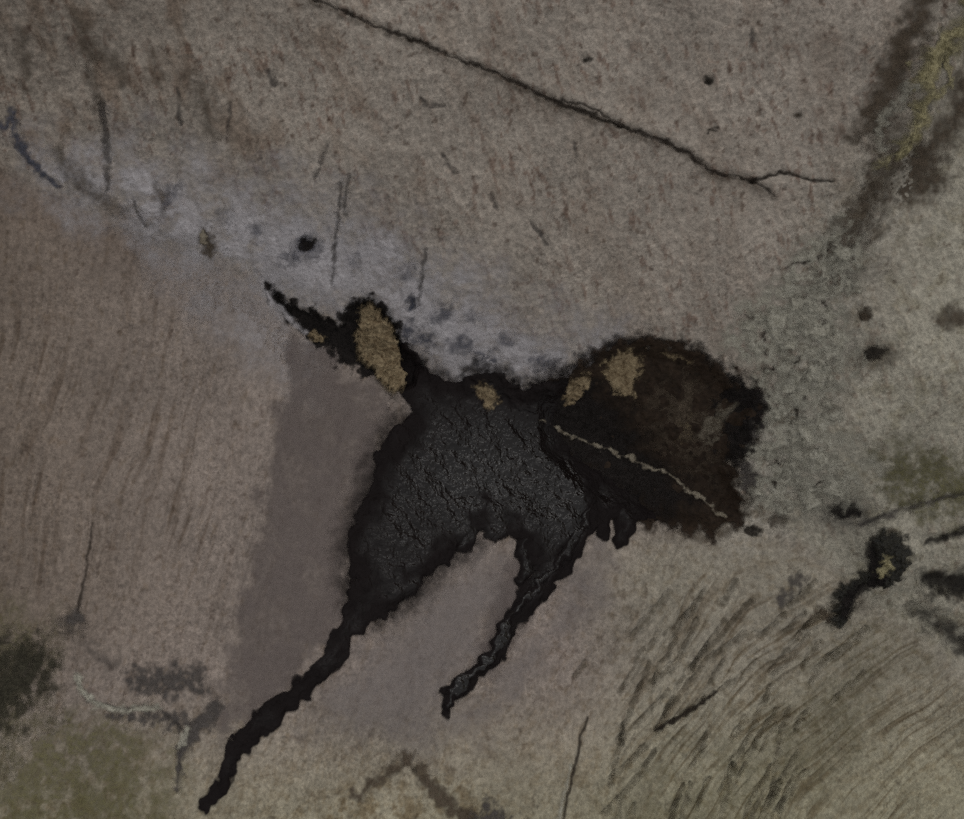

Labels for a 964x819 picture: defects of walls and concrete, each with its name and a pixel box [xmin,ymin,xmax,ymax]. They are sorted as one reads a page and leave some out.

leakage [0,108,109,198]
crack [313,0,831,194]
leakage [875,18,964,168]
spalling [264,281,410,394]
leakage [120,166,657,815]
spalling [543,335,769,545]
leakage [0,636,60,734]
crack [559,717,588,819]